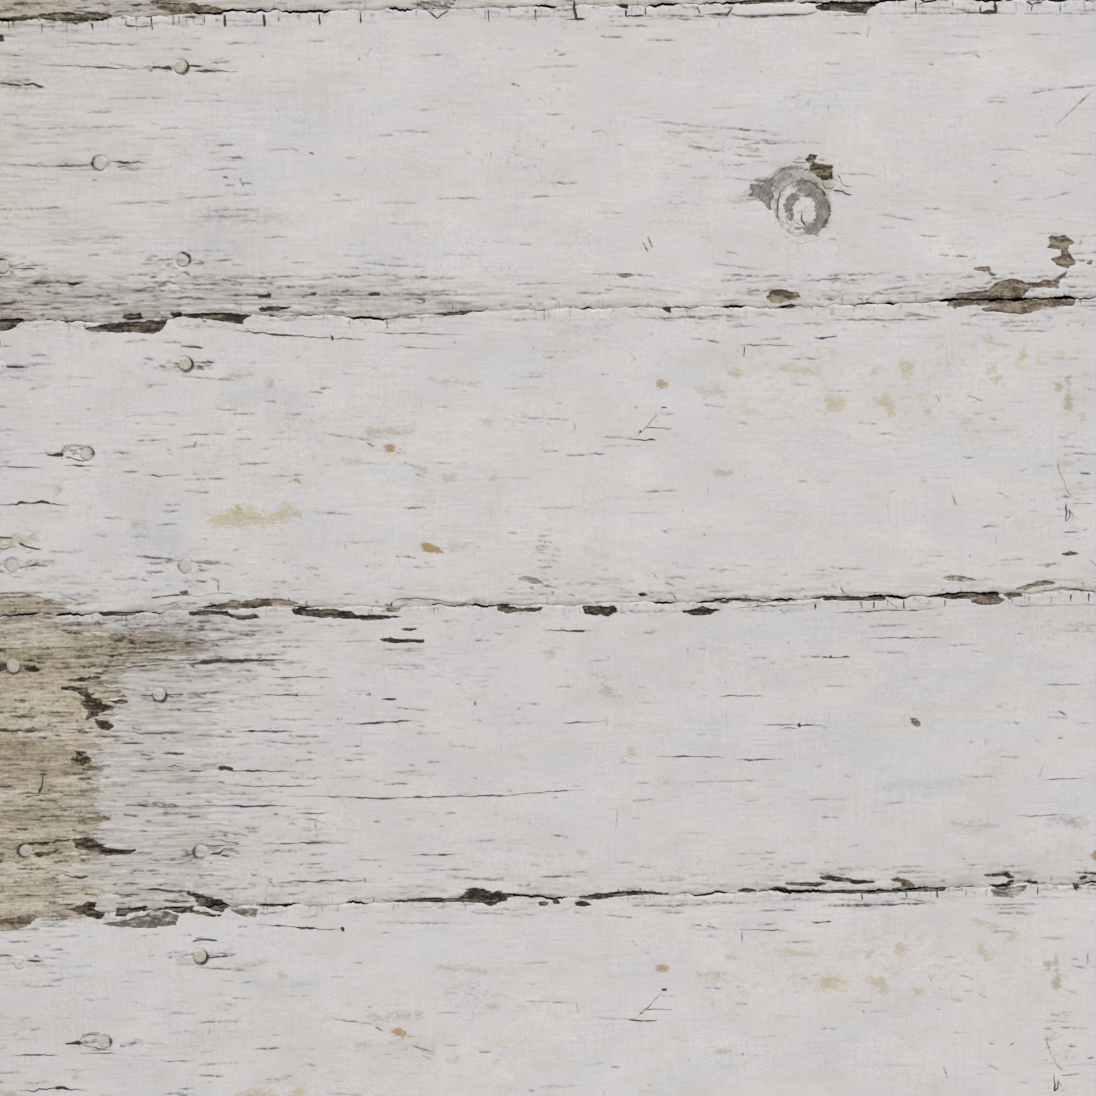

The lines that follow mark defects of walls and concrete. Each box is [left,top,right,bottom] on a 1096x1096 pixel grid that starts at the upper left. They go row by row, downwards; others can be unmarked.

peeling [0,0,223,42]
peeling [731,0,876,16]
peeling [947,235,1092,314]
peeling [0,264,290,334]
peeling [189,598,424,643]
crack [719,599,816,609]
crack [1051,587,1096,602]
peeling [0,595,289,931]
crack [118,888,188,903]